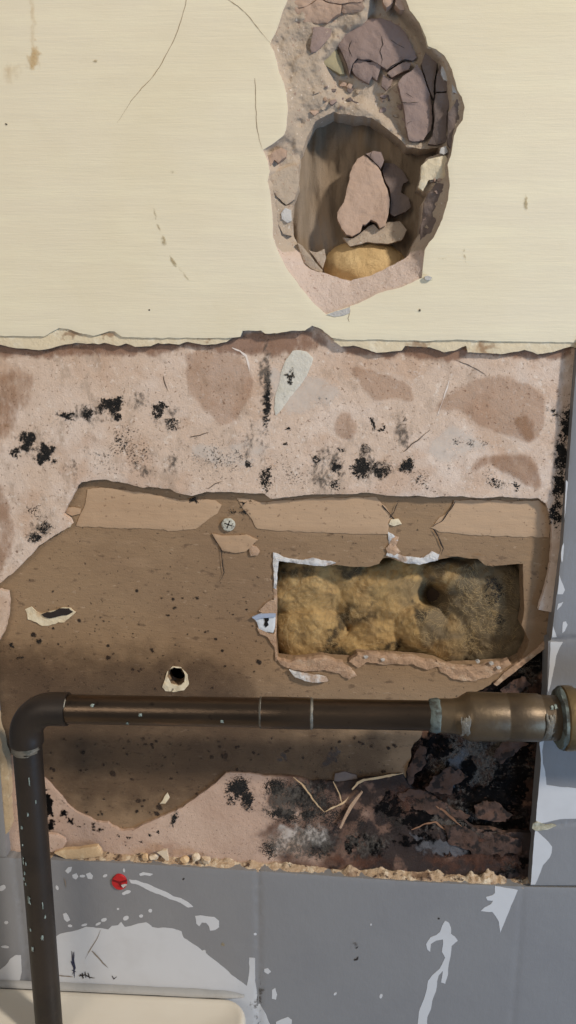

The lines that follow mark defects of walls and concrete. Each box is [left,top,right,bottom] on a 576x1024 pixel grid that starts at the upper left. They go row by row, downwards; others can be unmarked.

crack [119,4,186,120]
spalling [263,0,464,317]
peeling [0,328,231,350]
damp [0,331,321,431]
peeling [333,338,576,354]
mould [8,431,56,466]
mould [312,416,416,492]
mould [548,405,570,529]
damp [224,731,534,878]
spalling [531,741,576,885]
spalling [56,908,292,1024]
spalling [418,921,458,1024]